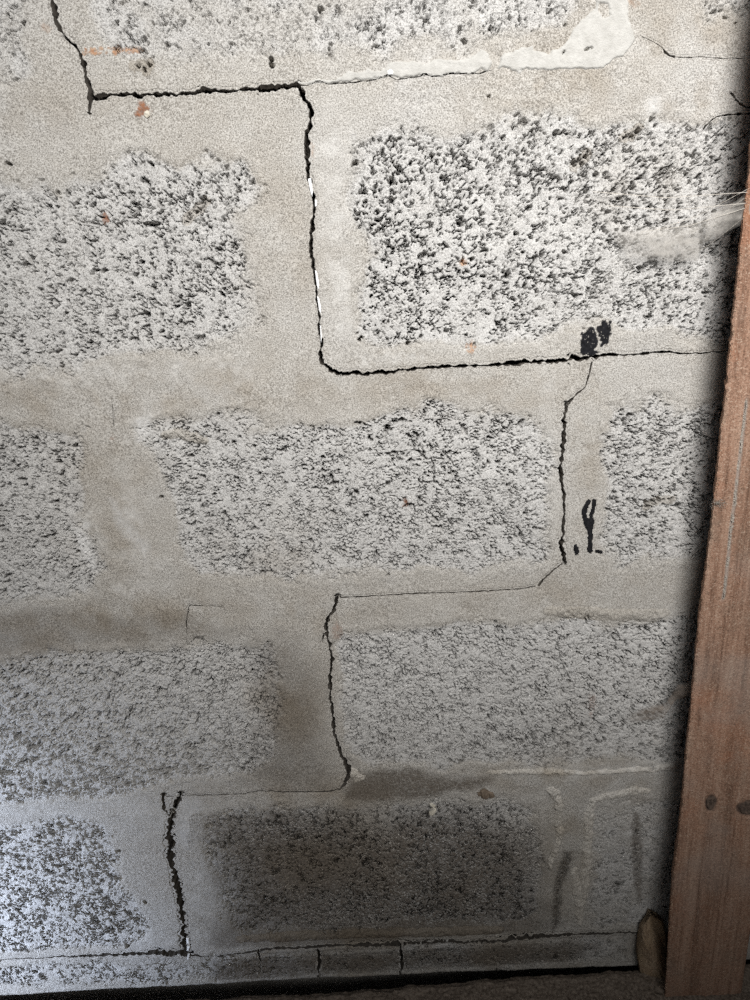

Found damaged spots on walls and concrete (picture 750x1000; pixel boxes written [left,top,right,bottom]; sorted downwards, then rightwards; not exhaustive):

crack [639,34,750,132]
crack [48,0,728,378]
crack [0,361,638,978]
water stain [347,772,484,800]
water stain [222,815,531,934]